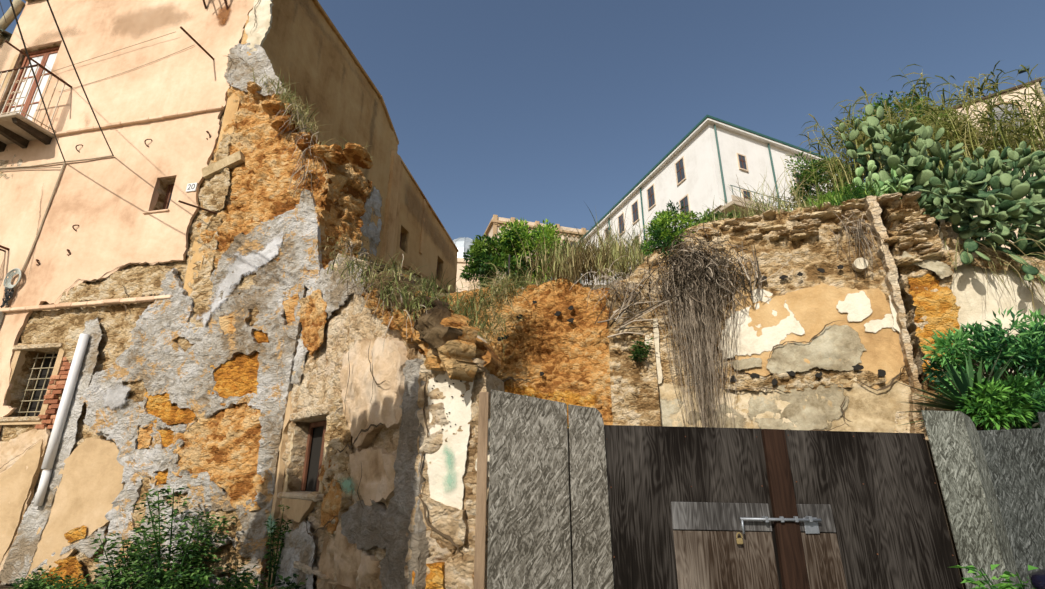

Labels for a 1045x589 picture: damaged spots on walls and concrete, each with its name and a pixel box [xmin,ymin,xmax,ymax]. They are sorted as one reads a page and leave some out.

peeling [21,173,397,589]
peeling [412,371,474,589]
peeling [659,268,905,430]
spalling [908,273,961,395]